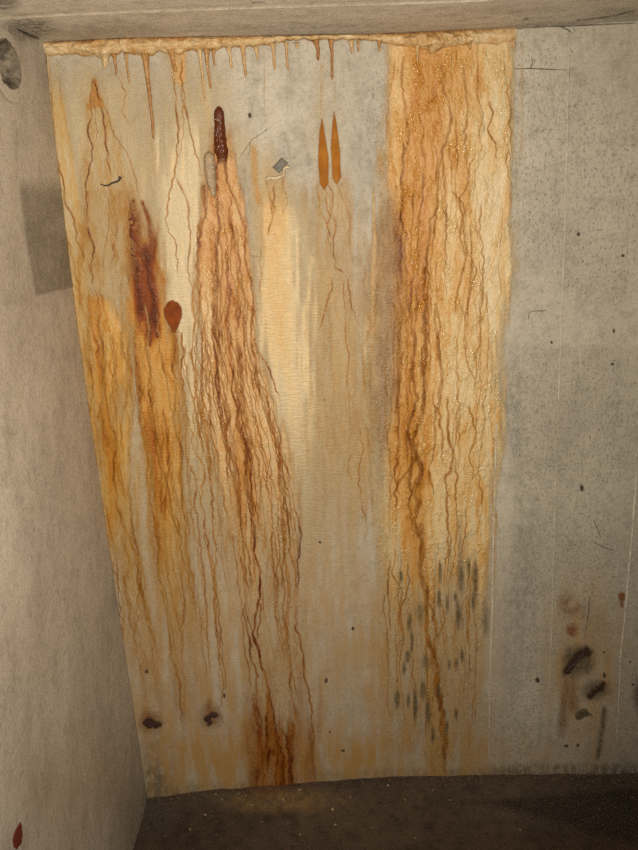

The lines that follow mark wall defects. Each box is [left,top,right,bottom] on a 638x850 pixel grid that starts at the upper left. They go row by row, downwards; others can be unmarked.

rust [51,78,194,648]
rust [193,106,315,787]
leakage [43,28,517,703]
rust [316,41,515,760]